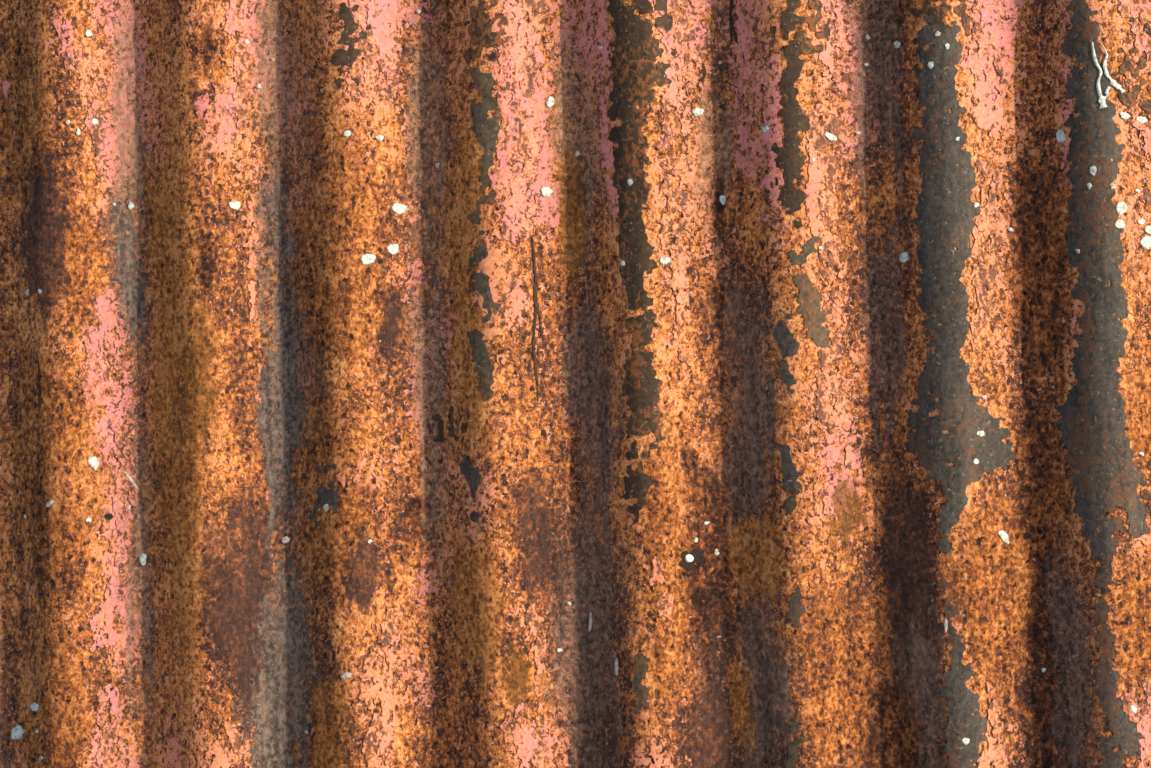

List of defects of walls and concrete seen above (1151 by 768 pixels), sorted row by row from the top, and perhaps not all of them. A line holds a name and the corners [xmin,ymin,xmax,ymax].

rust [3,16,114,610]
rust [147,121,271,718]
rust [291,123,402,369]
peeling [464,0,553,402]
peeling [591,0,714,525]
rust [645,417,783,768]
peeling [730,0,852,435]
rust [798,580,920,768]
peeling [905,0,1024,553]
peeling [938,572,1009,768]
rust [950,413,1071,768]
peeling [1054,0,1151,768]